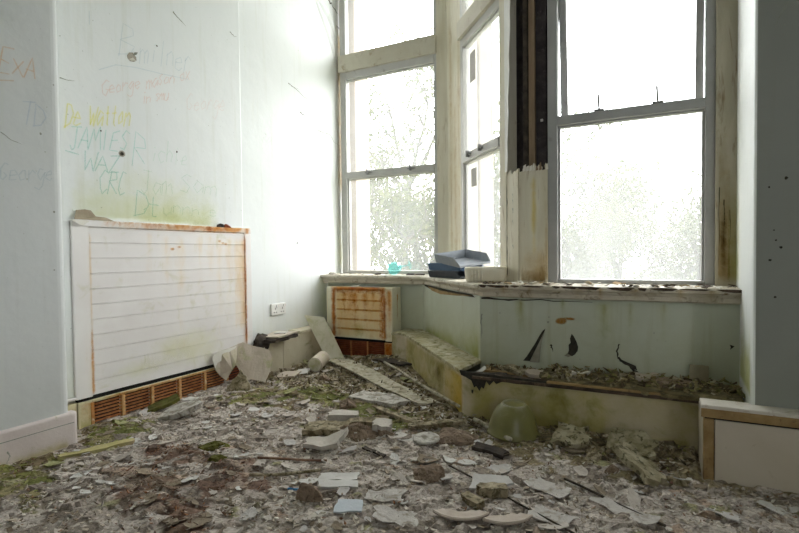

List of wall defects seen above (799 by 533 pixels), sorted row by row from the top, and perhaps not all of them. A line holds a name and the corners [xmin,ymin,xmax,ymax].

peeling [520,163,548,172]
peeling [479,281,742,293]
corrosion [332,287,398,338]
peeling [523,321,549,363]
peeling [564,334,578,357]
crack [616,344,638,372]